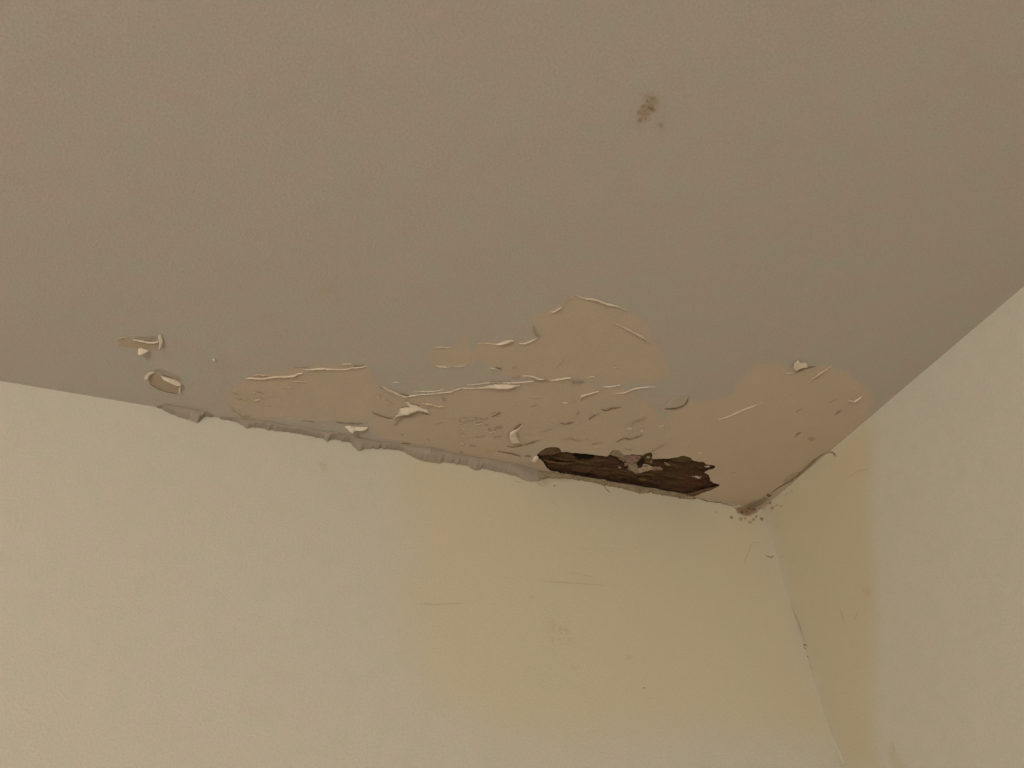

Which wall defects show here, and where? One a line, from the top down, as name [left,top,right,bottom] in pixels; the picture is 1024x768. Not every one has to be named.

peeling [116,334,163,355]
peeling [144,370,181,394]
peeling [345,345,880,509]